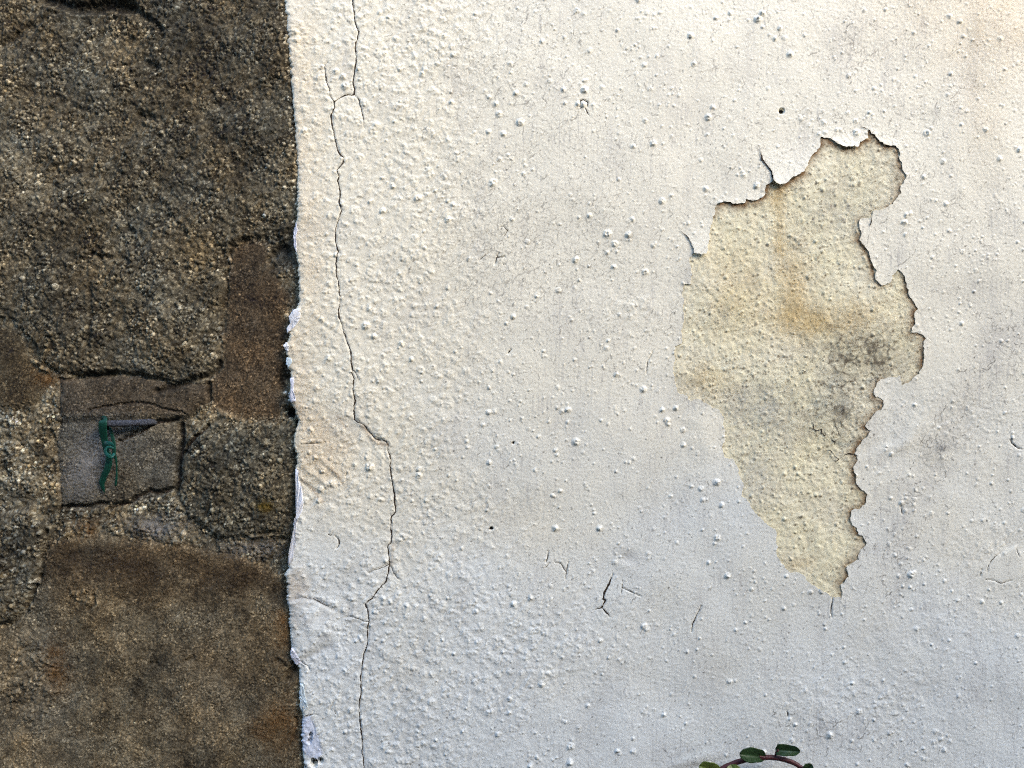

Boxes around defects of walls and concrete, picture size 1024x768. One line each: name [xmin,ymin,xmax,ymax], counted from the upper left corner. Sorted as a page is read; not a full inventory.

crack [305,0,397,766]
crack [597,575,634,615]
peeling [673,126,925,604]